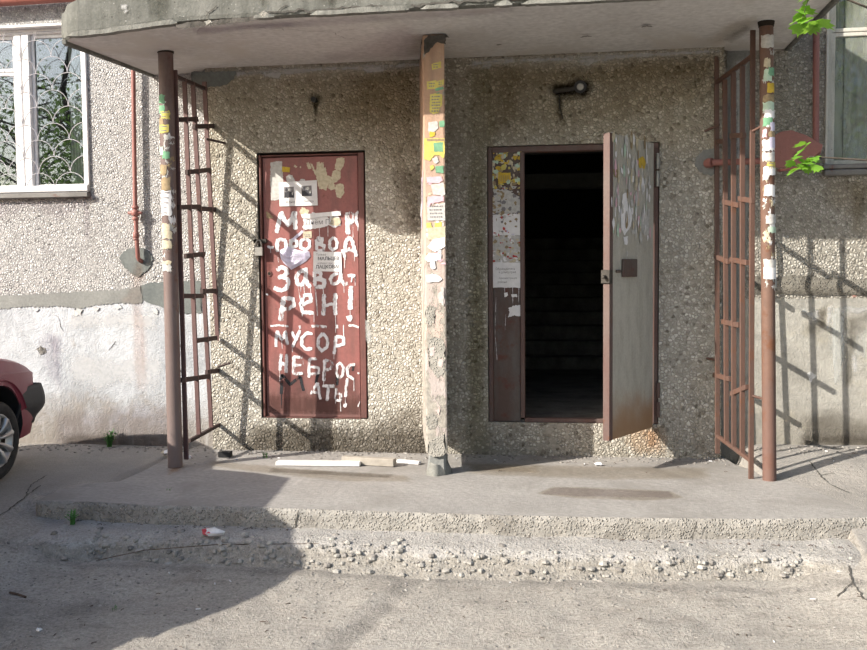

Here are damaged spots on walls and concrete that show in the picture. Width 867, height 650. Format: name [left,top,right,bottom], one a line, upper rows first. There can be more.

peeling [425,292,445,326]
peeling [427,337,446,378]
water stain [831,307,867,382]
spalling [426,409,445,457]